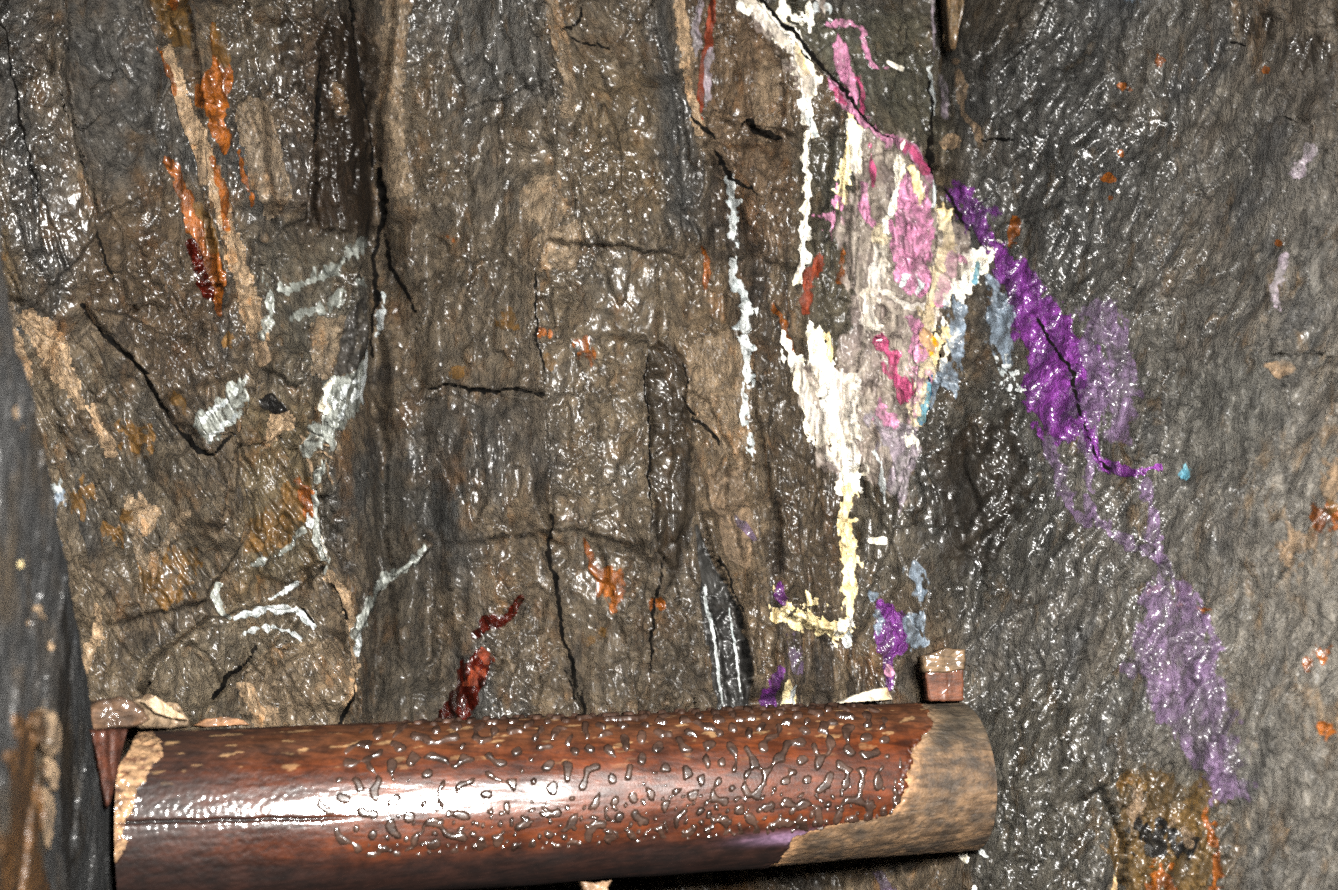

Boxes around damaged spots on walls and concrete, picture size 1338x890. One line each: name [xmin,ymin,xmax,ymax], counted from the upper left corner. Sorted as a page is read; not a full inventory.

corrosion [150,0,193,96]
crack [0,22,39,194]
corrosion [163,22,255,317]
crack [96,226,114,280]
crack [80,303,236,456]
corrosion [114,419,156,454]
corrosion [68,473,98,521]
corrosion [100,509,133,549]
corrosion [137,544,203,611]
corrosion [438,595,524,720]
crack [545,513,587,714]